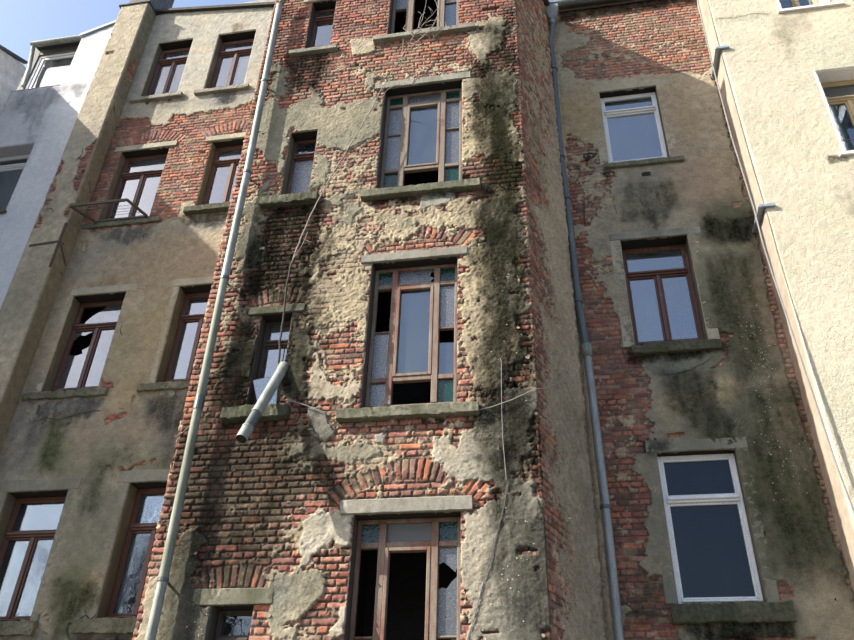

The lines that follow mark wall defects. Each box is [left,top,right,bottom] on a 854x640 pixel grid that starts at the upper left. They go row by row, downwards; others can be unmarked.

flaking render [34,159,65,229]
flaking render [133,319,212,640]
flaking render [84,1,384,308]
leakage [220,320,258,406]
leakage [242,204,331,407]
flaking render [265,509,354,640]
flaking render [284,267,371,397]
flaking render [285,407,387,468]
leakage [472,21,542,488]
flaking render [370,0,755,640]
leakage [703,212,755,242]
flaking render [706,233,853,589]